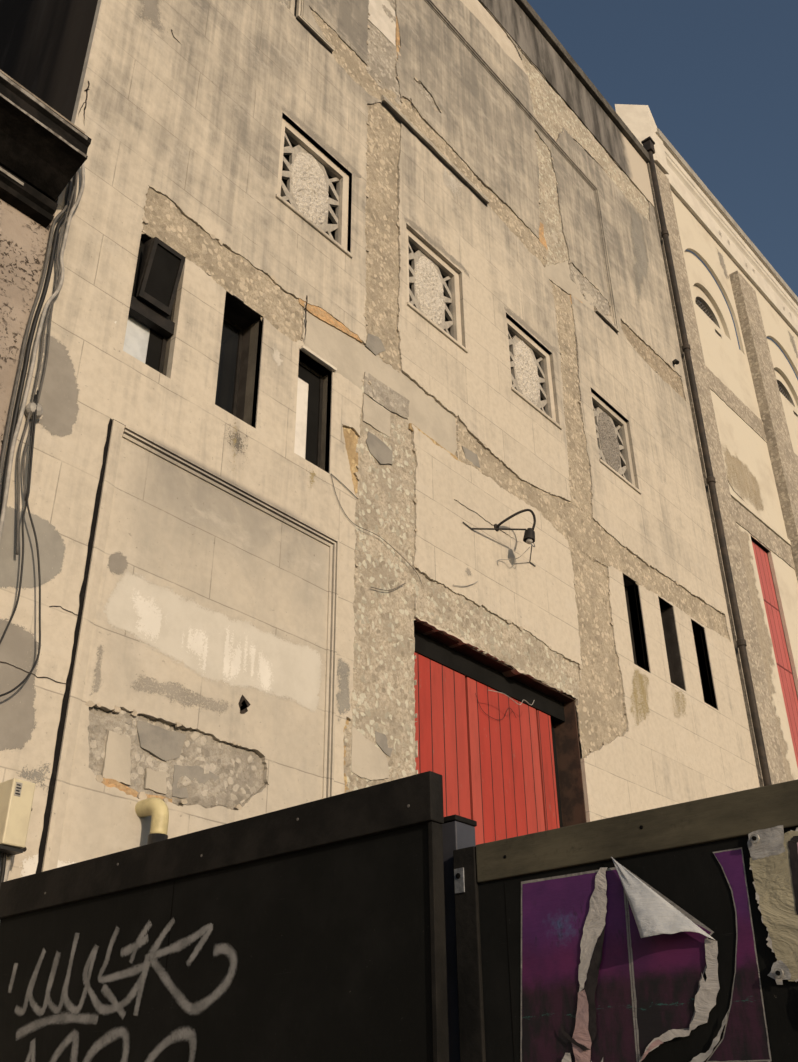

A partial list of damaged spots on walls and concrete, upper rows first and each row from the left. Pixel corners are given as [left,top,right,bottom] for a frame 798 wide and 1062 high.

water stain [36,334,80,437]
spalling [141,187,303,342]
spalling [311,0,730,641]
water stain [0,506,66,589]
water stain [0,618,42,751]
spalling [85,700,265,810]